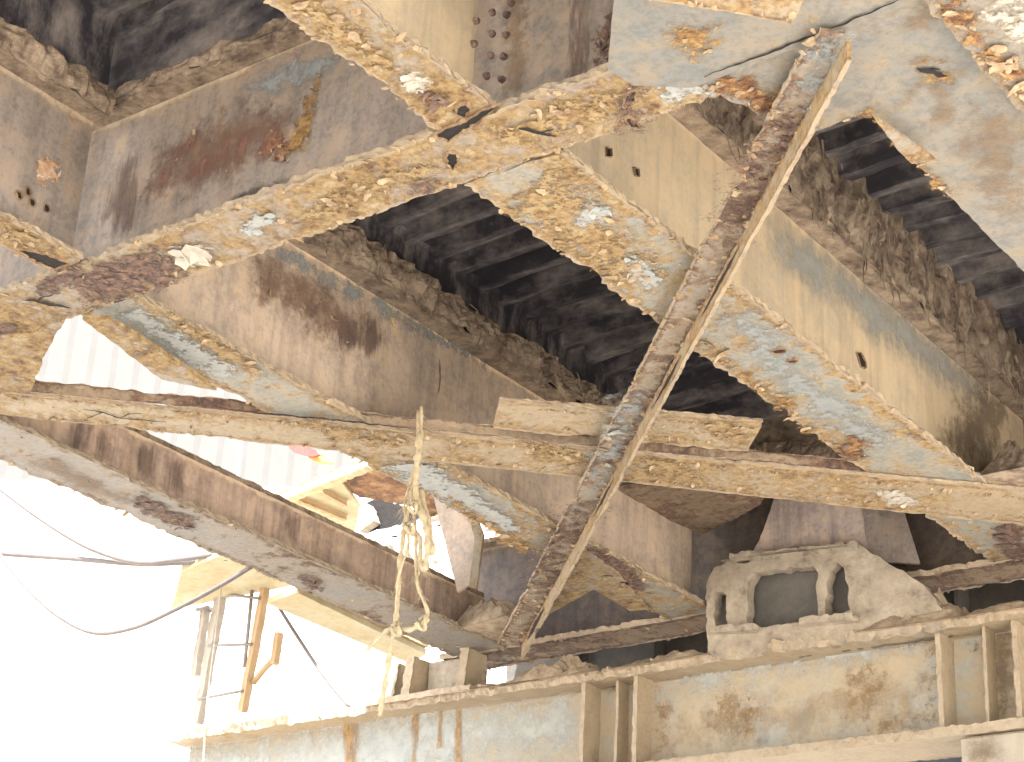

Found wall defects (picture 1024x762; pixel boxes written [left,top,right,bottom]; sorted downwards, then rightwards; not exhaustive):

rust [795,28,821,64]
rust [145,75,321,192]
peeling [14,156,62,213]
rust [0,213,217,391]
rust [246,73,809,665]
rust [1,393,211,551]
rust [970,514,1024,583]
rust [343,723,358,762]
rust [708,694,759,735]